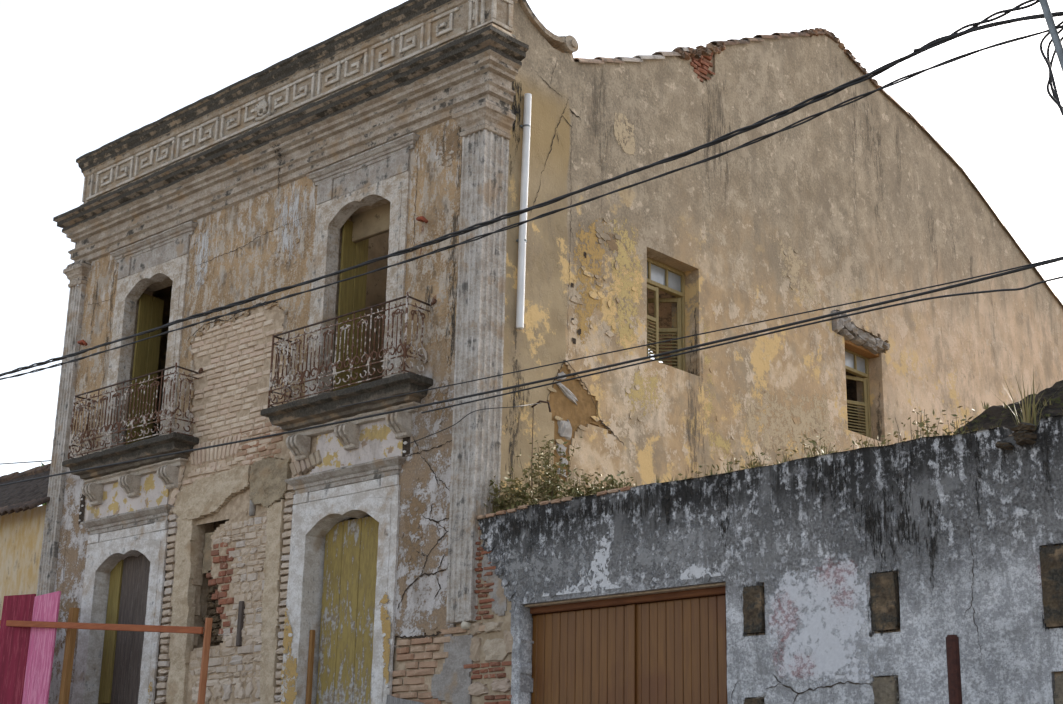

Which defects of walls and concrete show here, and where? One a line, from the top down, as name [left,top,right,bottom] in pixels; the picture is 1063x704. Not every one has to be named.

flaking render [675,41,726,82]
crack [531,61,624,445]
peeling [570,216,643,358]
spalling [78,494,86,524]
spalling [196,488,267,646]
flaking render [168,301,322,529]
flaking render [379,527,516,704]
peeling [529,532,622,601]
leakage [809,451,943,588]
leakage [967,434,987,517]
crack [766,676,873,704]